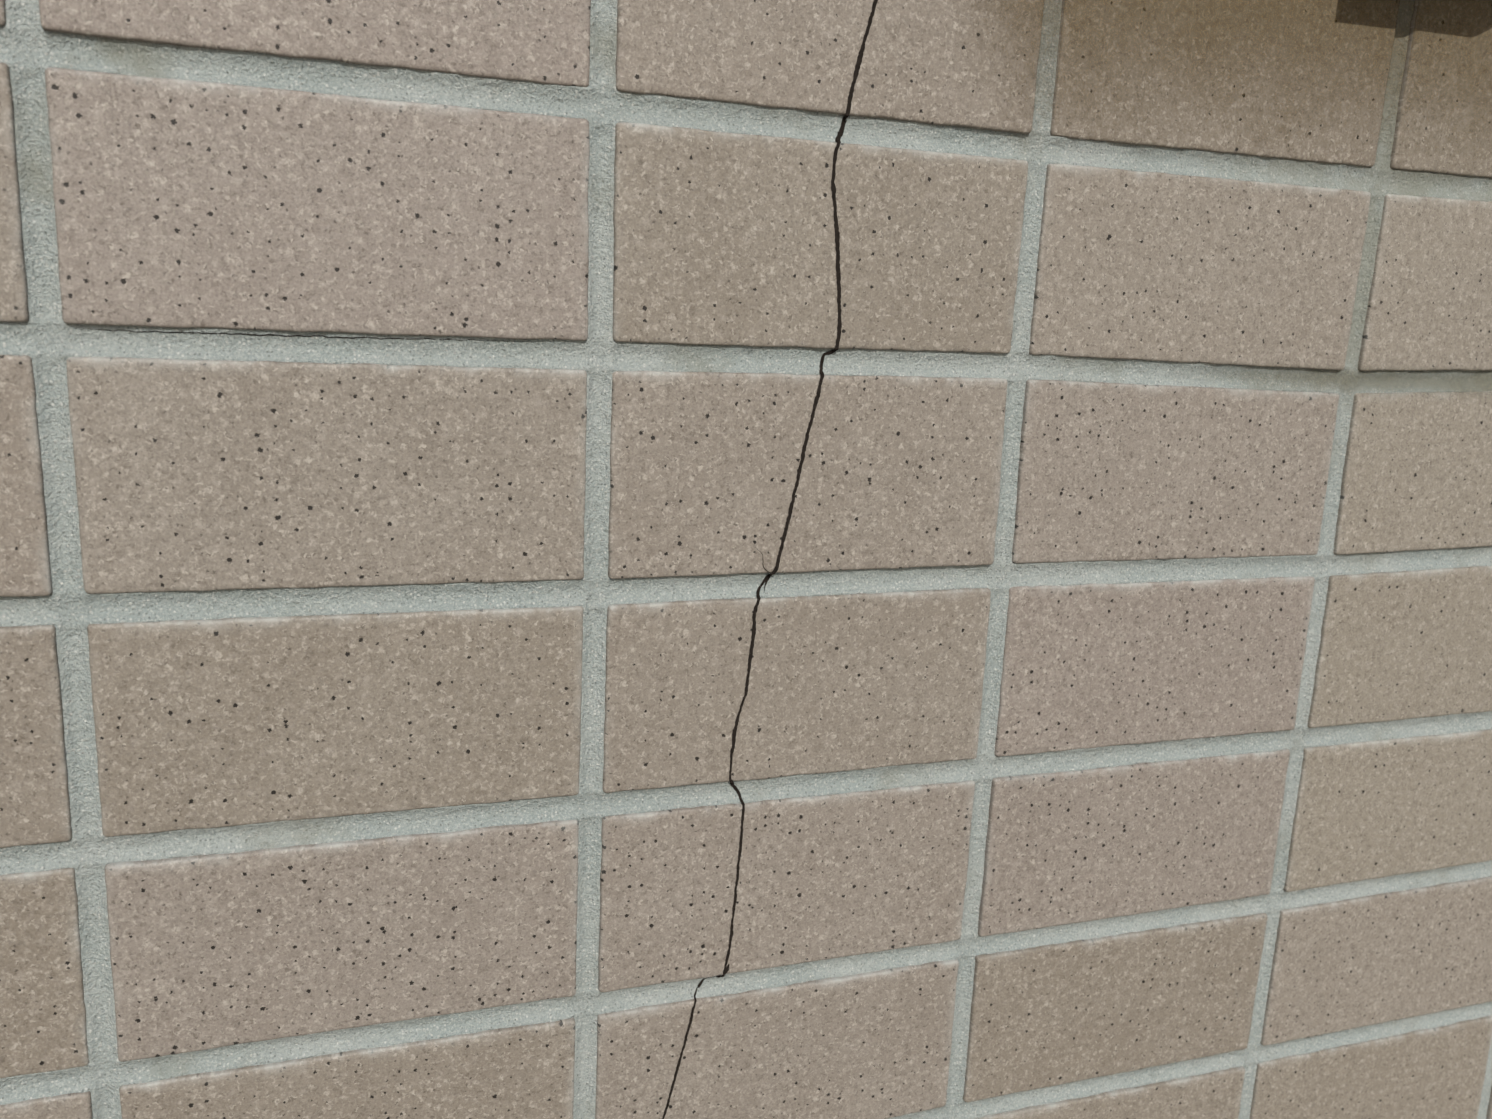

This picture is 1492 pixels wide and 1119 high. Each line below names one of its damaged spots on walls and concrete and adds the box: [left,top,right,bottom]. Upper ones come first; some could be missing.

crack [662,0,878,1119]